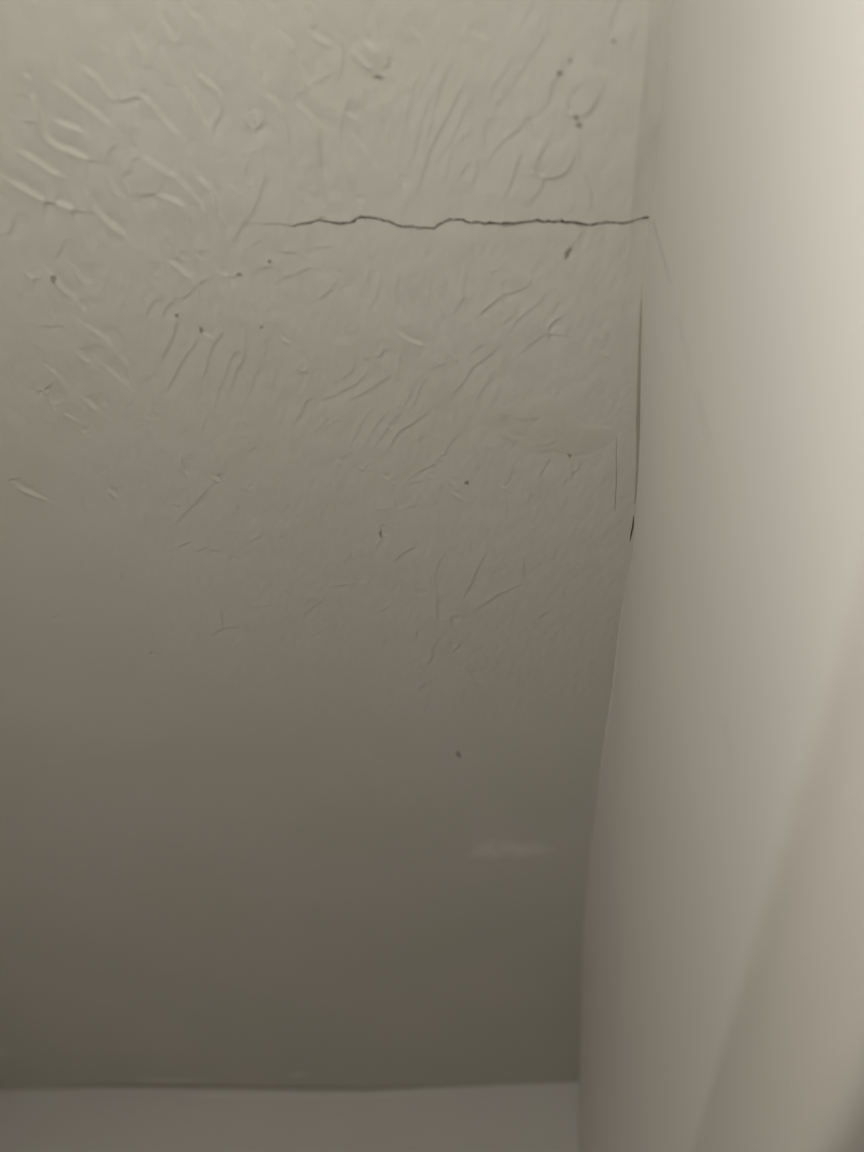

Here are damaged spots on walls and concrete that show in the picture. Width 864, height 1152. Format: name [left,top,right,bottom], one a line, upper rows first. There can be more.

crack [248,216,649,229]